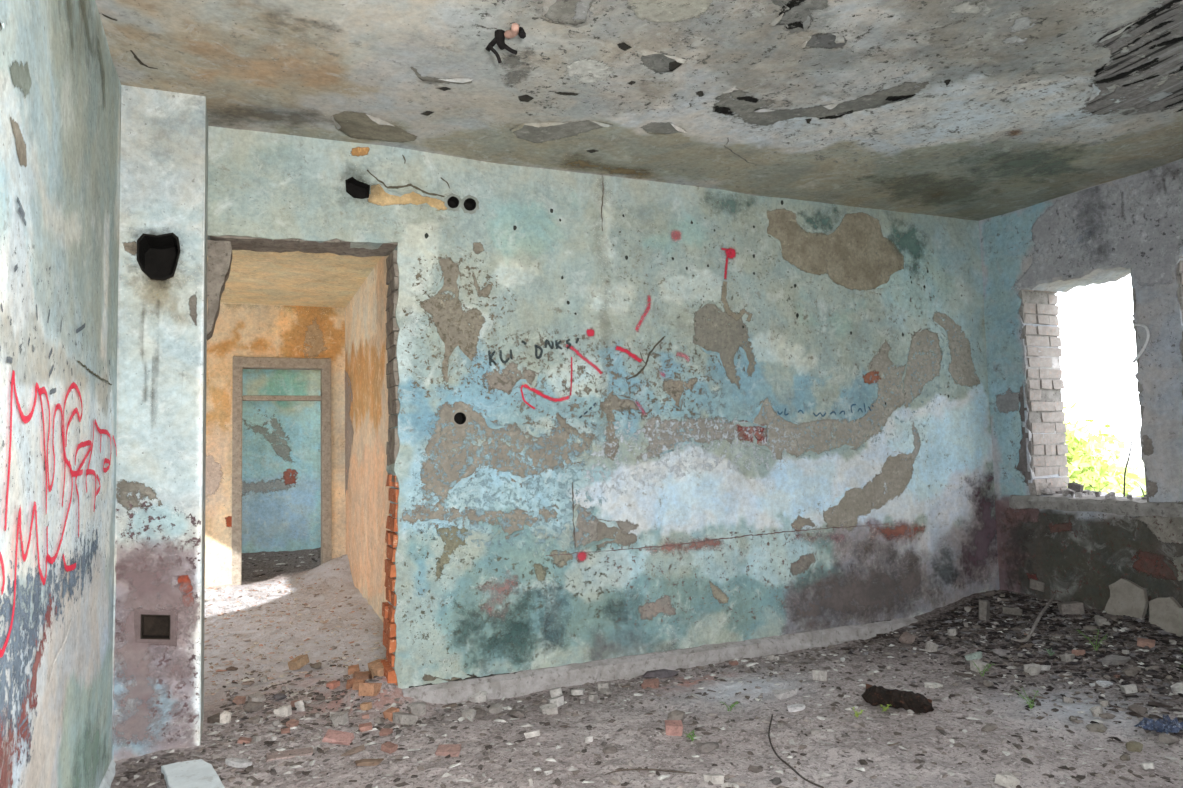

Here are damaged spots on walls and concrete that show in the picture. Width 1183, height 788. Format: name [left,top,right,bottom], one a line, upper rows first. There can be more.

peeling [10,117,27,167]
peeling [9,61,32,98]
spalling [473,0,1183,181]
peeling [400,200,983,684]
damp [783,474,1027,632]
damp [114,548,200,742]